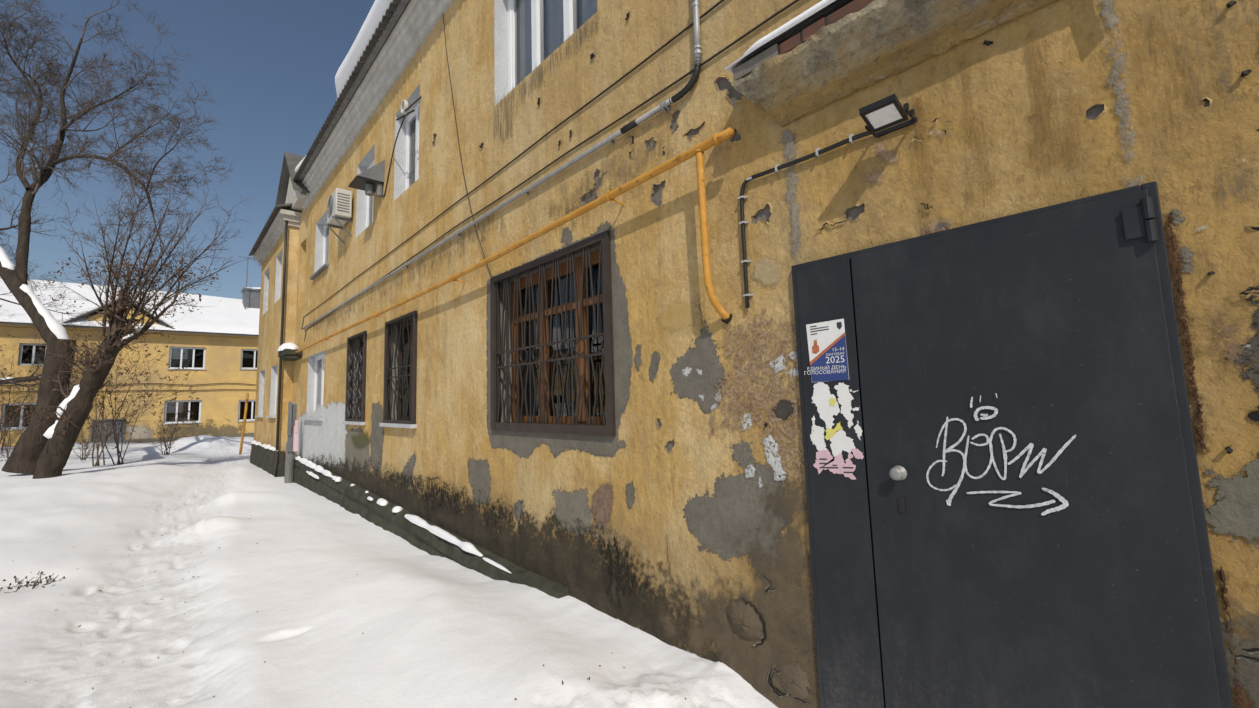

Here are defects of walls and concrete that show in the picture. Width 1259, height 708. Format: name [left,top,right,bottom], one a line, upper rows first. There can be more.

spalling [628,109,706,159]
spalling [580,167,608,207]
spalling [650,180,667,209]
spalling [843,200,867,223]
rust [1162,212,1209,454]
peeling [709,307,804,491]
peeling [588,484,629,559]
damp [311,455,820,708]
rust [1219,566,1254,708]
crack [1235,648,1259,665]